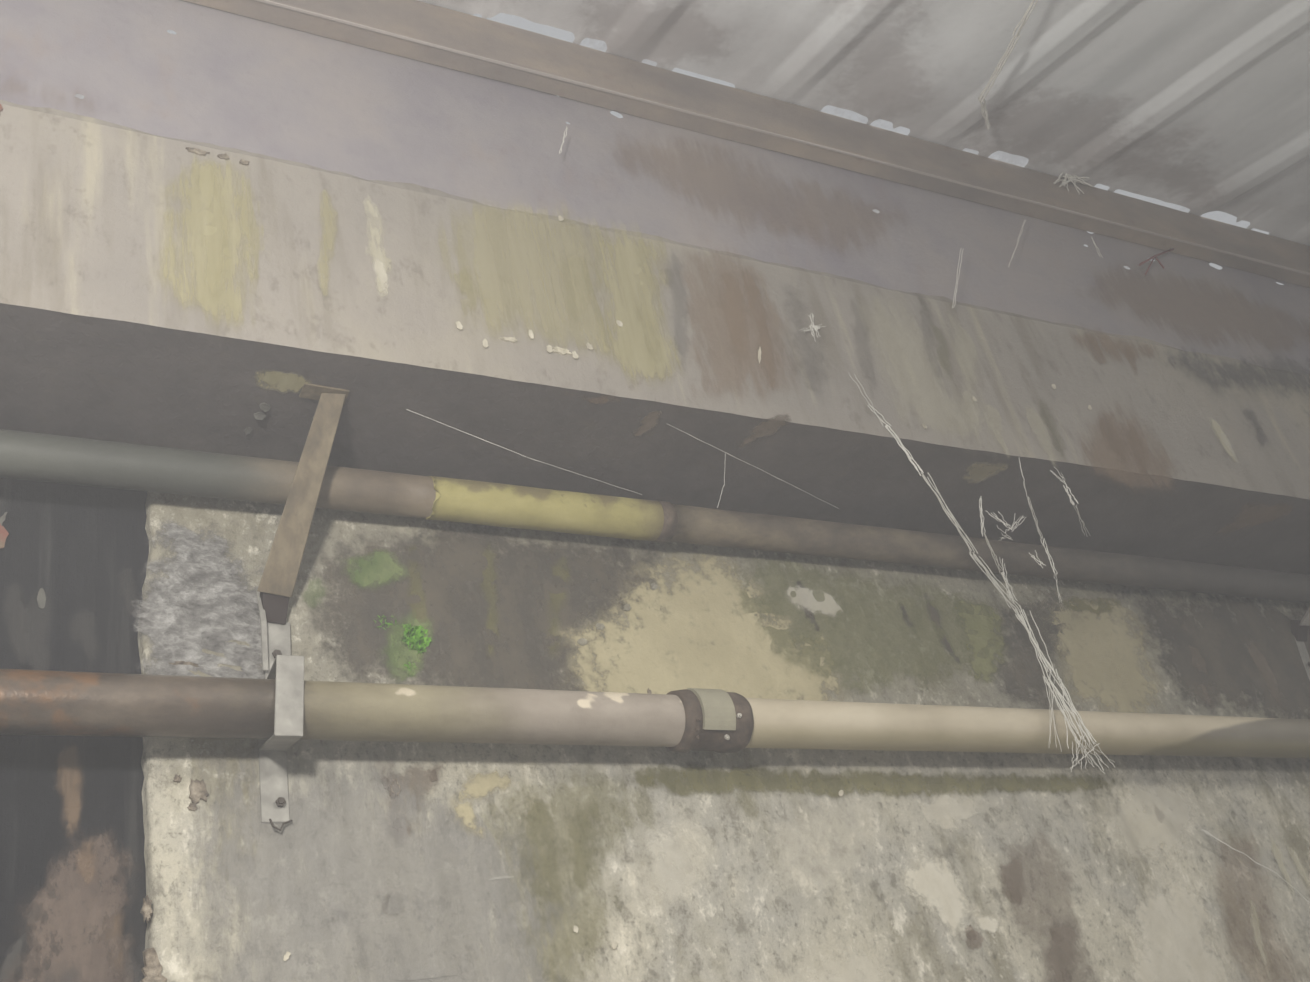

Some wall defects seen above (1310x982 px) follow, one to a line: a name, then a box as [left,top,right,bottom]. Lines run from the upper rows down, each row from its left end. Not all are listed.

damp [320,525,656,691]
damp [999,591,1061,709]
peeling [0,835,167,982]